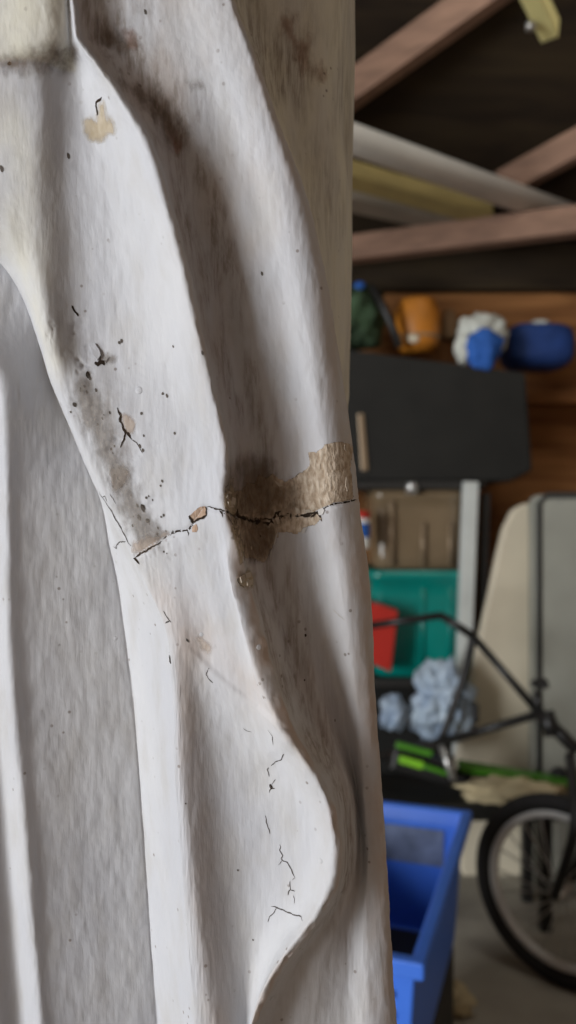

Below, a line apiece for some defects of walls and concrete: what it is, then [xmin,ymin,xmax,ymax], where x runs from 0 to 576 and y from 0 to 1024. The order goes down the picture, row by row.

crack [99,493,356,564]
peeling [224,442,353,588]
crack [243,728,302,921]